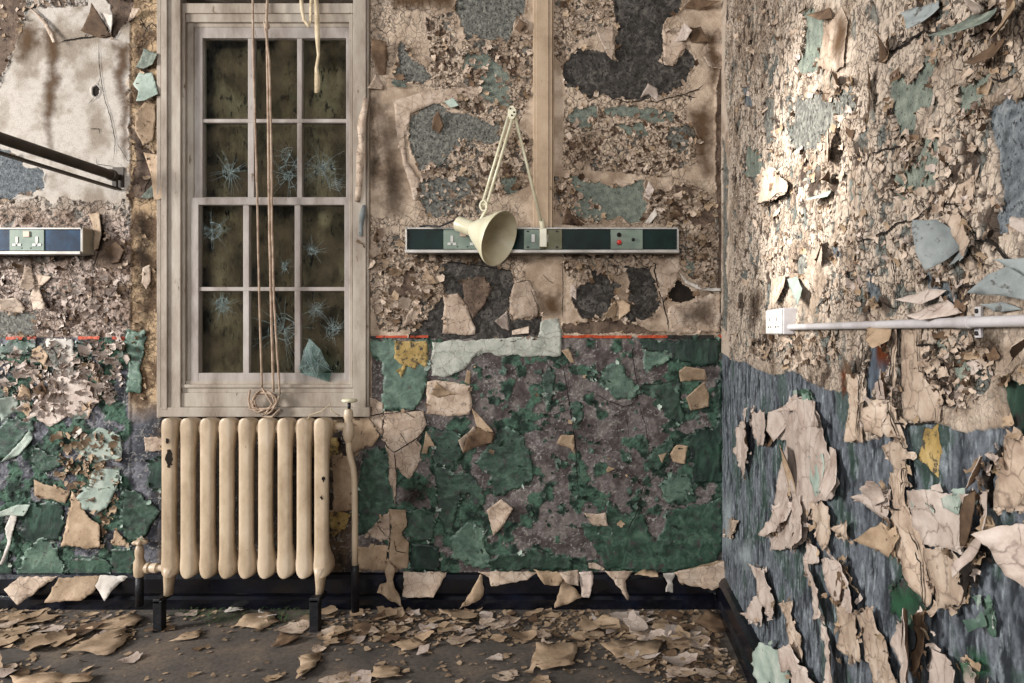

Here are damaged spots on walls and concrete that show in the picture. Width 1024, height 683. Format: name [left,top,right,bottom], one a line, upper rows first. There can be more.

water stain [20,27,58,127]
water stain [115,46,145,123]
water stain [138,220,148,296]
peeling [329,0,1024,683]
peeling [0,212,156,605]
peeling [144,435,162,463]